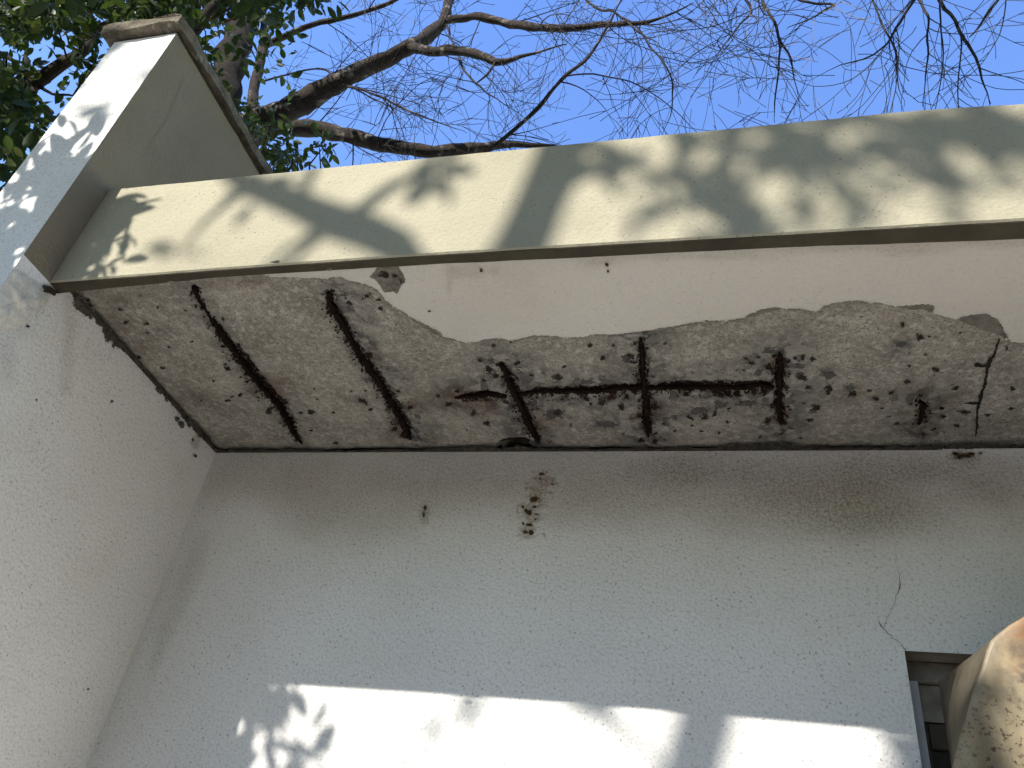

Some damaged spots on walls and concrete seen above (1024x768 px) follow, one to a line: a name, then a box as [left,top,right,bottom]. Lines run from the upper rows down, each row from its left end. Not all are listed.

spalling [42,266,1024,450]
crack [75,294,1024,453]
rust [521,496,540,535]
crack [878,551,906,650]